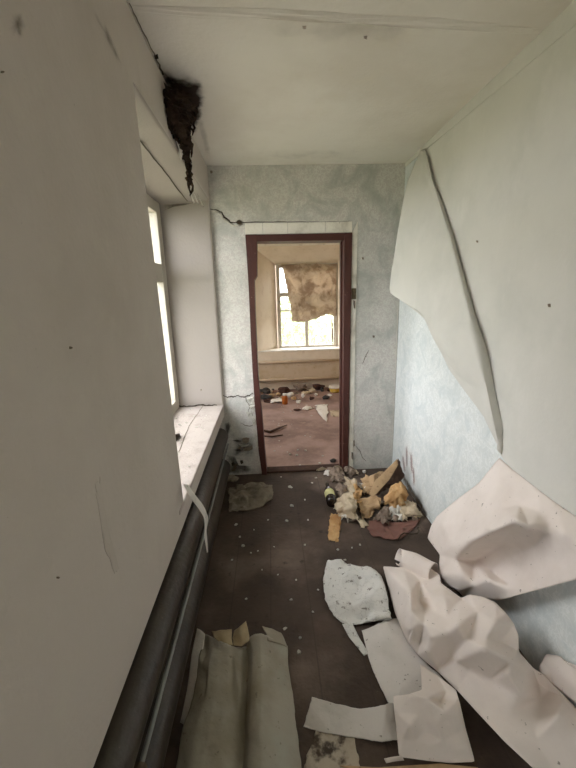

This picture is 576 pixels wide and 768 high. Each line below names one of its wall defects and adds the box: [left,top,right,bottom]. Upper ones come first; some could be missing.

crack [211,209,257,226]
crack [178,393,253,452]